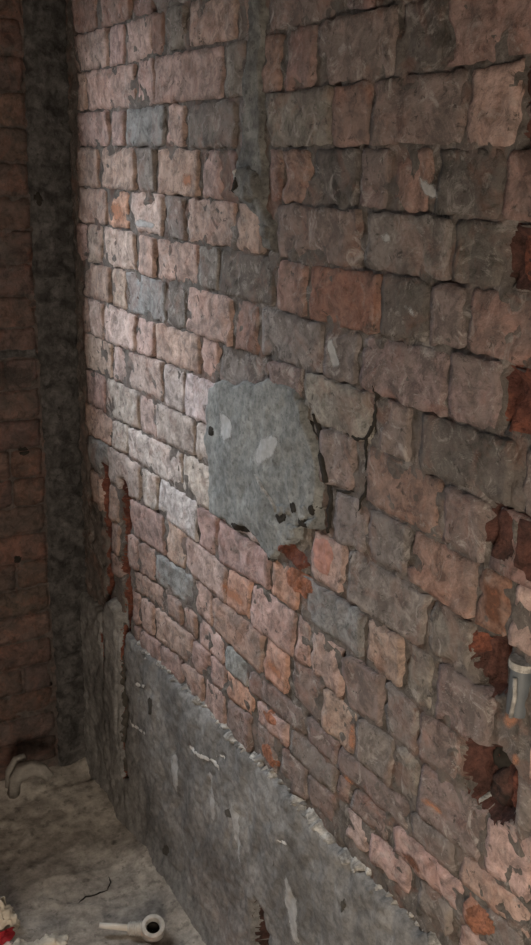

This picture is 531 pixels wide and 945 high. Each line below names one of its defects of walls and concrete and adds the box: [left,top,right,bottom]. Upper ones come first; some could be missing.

spalling [278,538,333,599]
flaking render [136,640,441,945]
spalling [465,904,495,936]